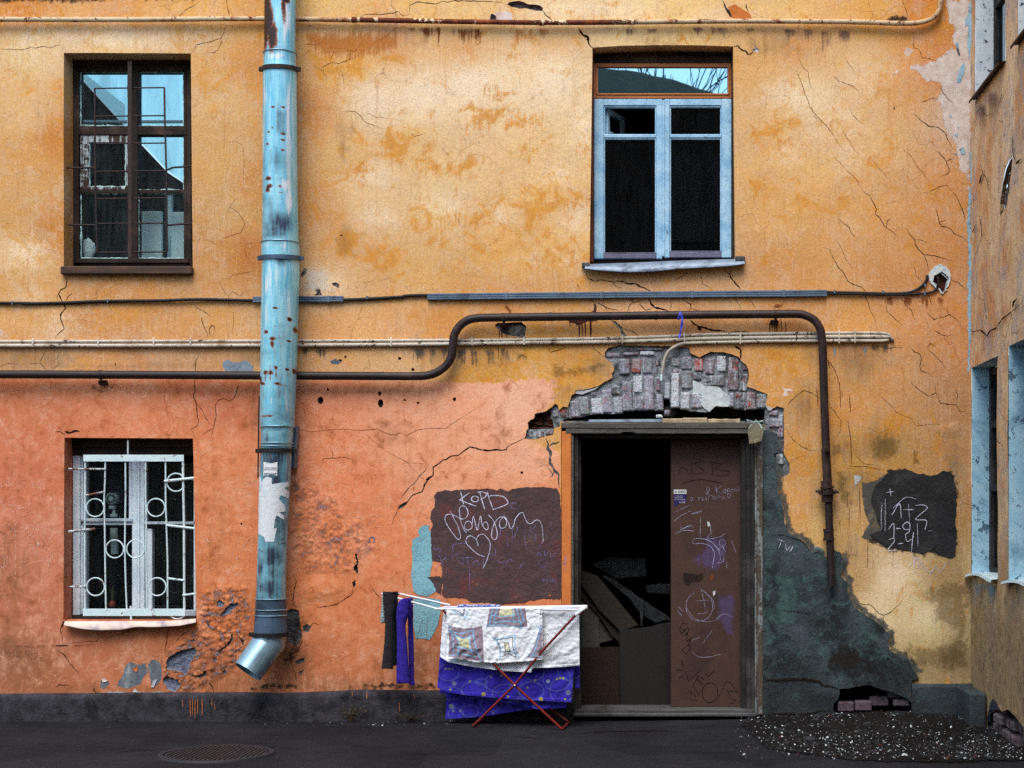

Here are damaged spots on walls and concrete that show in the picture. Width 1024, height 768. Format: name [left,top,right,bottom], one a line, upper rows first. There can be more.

damp [307,33,396,59]
crack [797,60,982,288]
peeling [893,0,971,372]
crack [6,276,71,367]
crack [191,208,251,434]
crack [305,403,560,527]
spalling [525,320,792,477]
crack [830,220,1023,426]
peeling [100,639,206,693]
spalling [833,685,911,713]